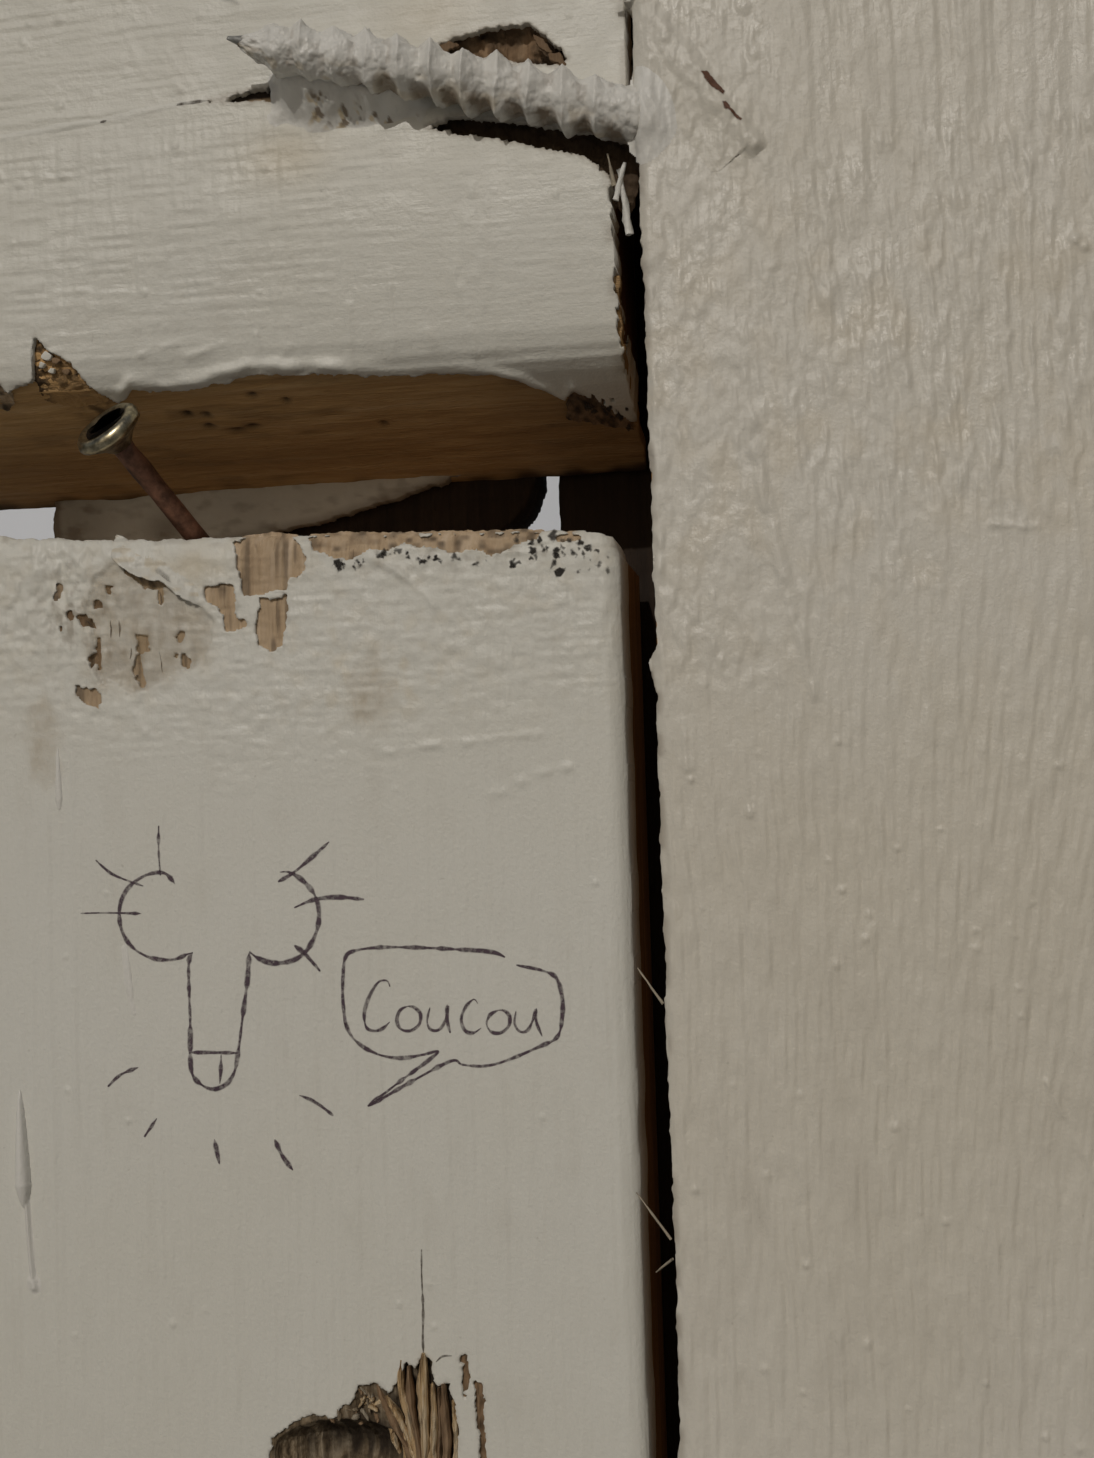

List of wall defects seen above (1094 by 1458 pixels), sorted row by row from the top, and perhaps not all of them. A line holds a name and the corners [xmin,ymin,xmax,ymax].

peeling [440,27,566,66]
peeling [34,341,108,408]
peeling [54,529,581,688]
peeling [76,685,102,709]
hole [269,1353,487,1458]